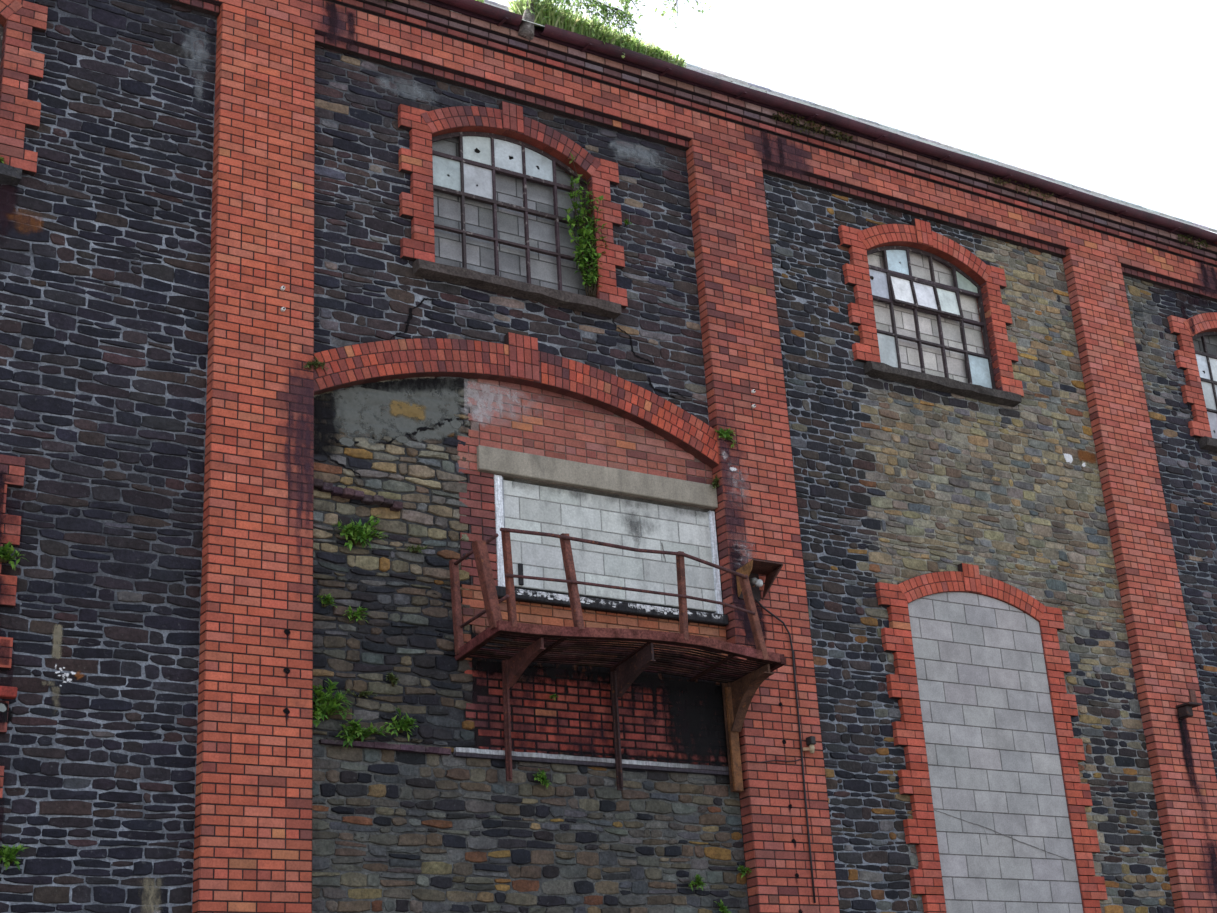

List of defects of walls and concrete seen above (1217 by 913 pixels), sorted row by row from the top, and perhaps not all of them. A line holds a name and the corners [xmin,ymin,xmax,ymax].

spalling [314,377,464,457]